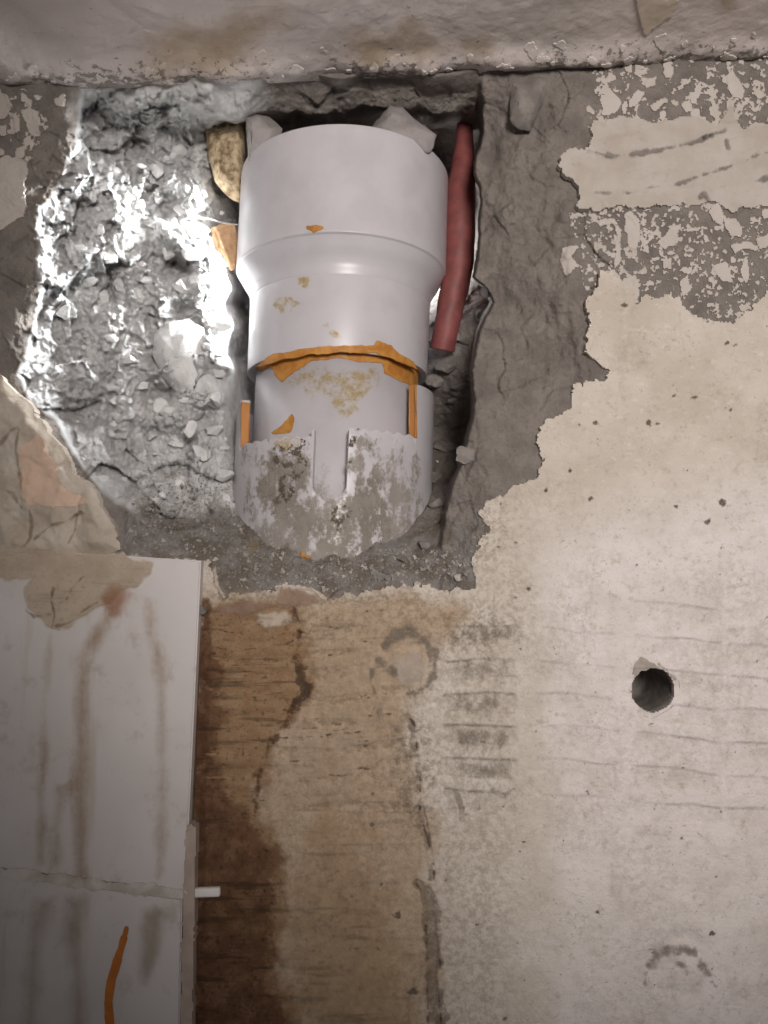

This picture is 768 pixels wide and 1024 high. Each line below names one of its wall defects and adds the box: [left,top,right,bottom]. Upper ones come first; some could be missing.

spalling [0,33,768,627]
damp [195,600,305,1024]